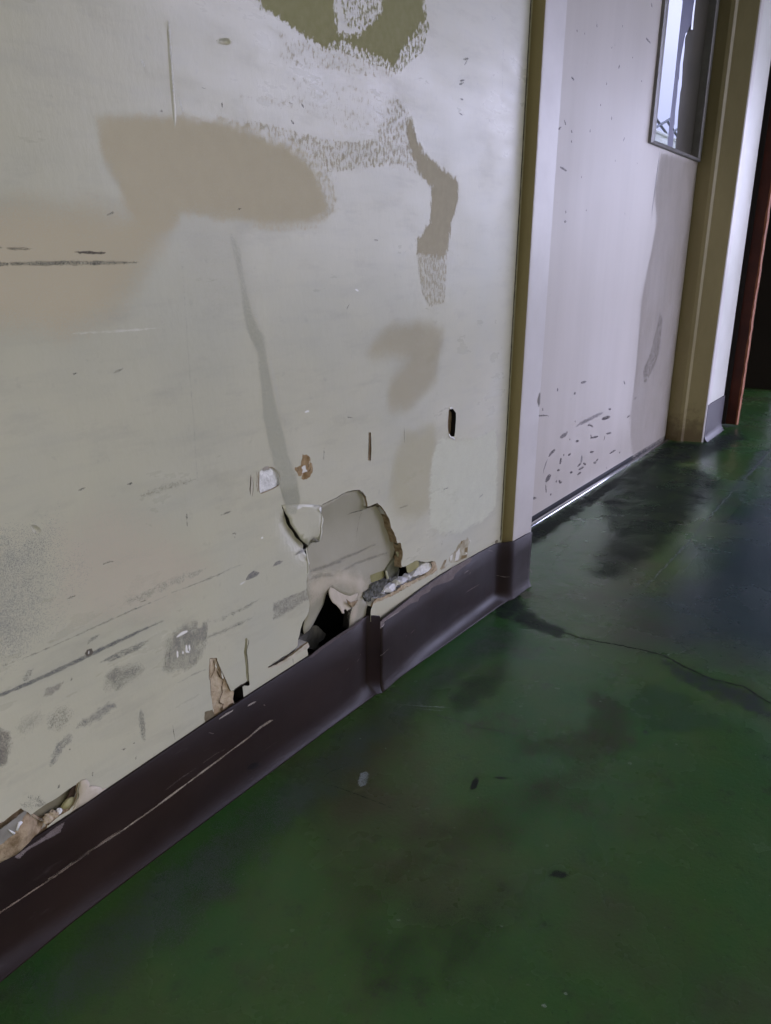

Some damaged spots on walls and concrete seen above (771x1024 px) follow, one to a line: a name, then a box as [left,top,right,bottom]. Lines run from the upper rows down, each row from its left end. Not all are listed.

flaking render [249,466,281,495]
peeling [295,454,313,480]
spalling [439,537,471,570]
spalling [313,592,345,637]
crack [490,596,771,726]
spalling [0,779,106,863]